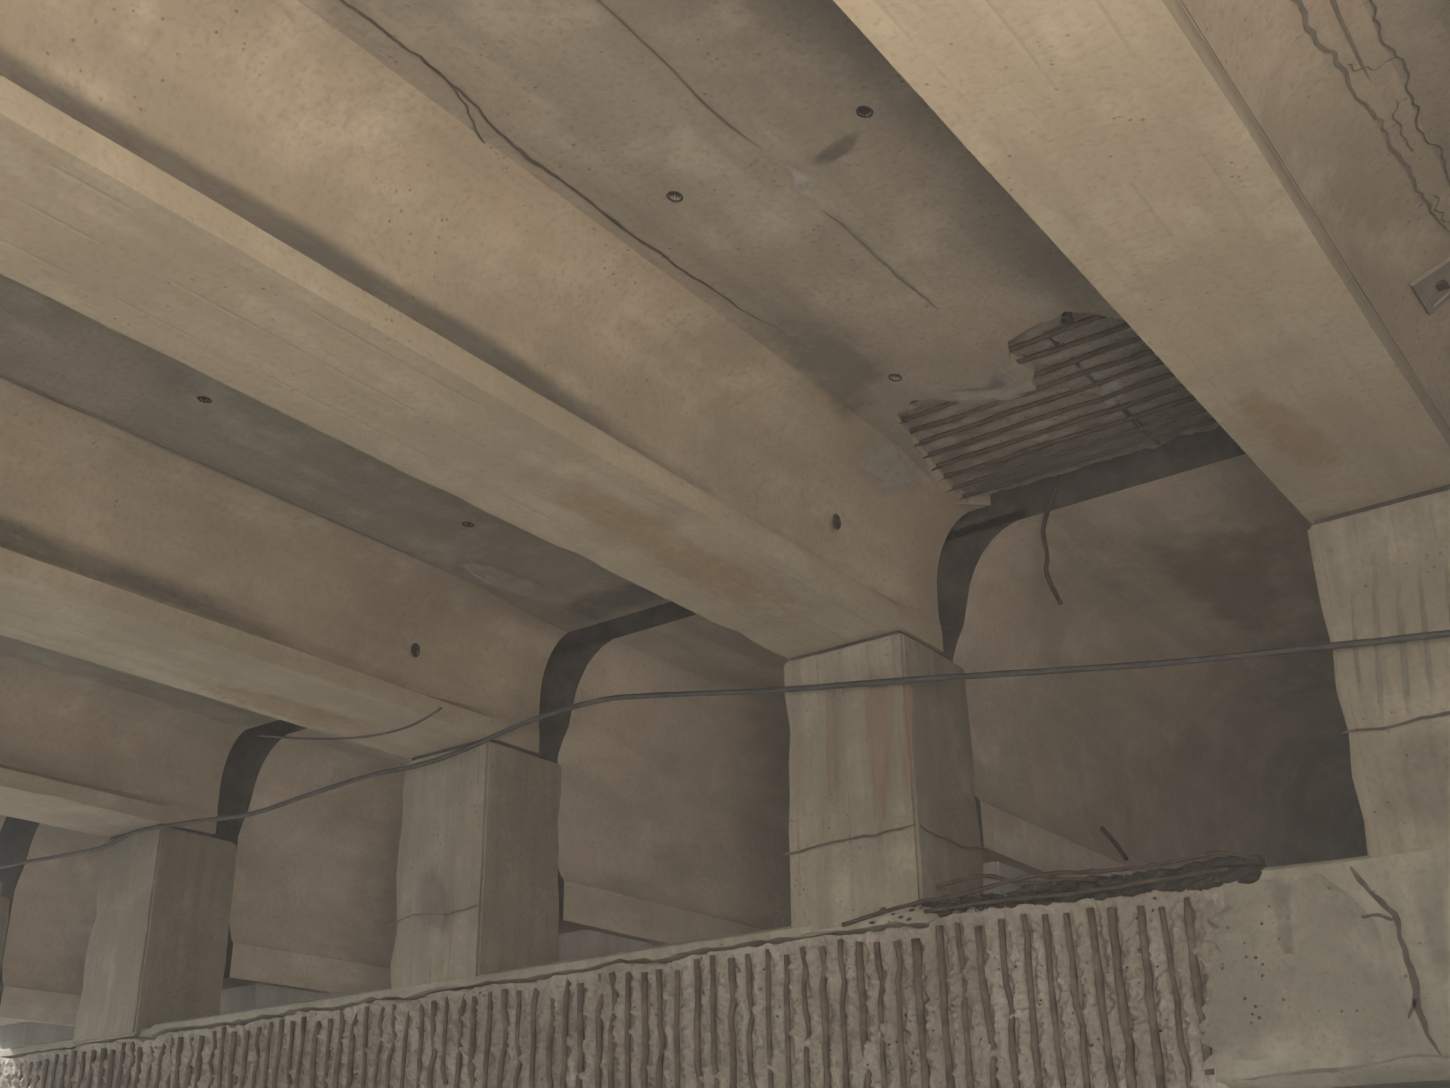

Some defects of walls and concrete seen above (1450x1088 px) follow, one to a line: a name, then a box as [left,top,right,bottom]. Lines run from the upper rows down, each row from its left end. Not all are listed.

crack [340,0,786,334]
crack [820,209,939,310]
crack [1181,0,1450,430]
spalling [899,312,1220,605]
spalling [0,826,1267,1088]
crack [785,824,990,856]
crack [1243,866,1450,1080]
crack [1343,711,1450,734]